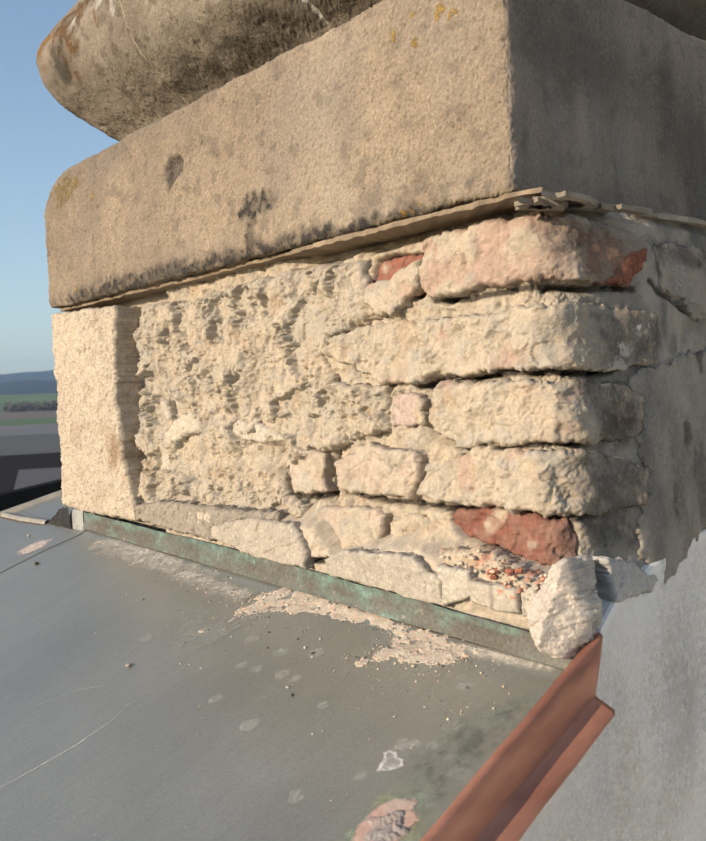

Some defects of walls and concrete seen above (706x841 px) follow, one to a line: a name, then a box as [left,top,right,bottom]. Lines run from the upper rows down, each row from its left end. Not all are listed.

spalling [133,259,548,617]
rust [346,796,423,841]